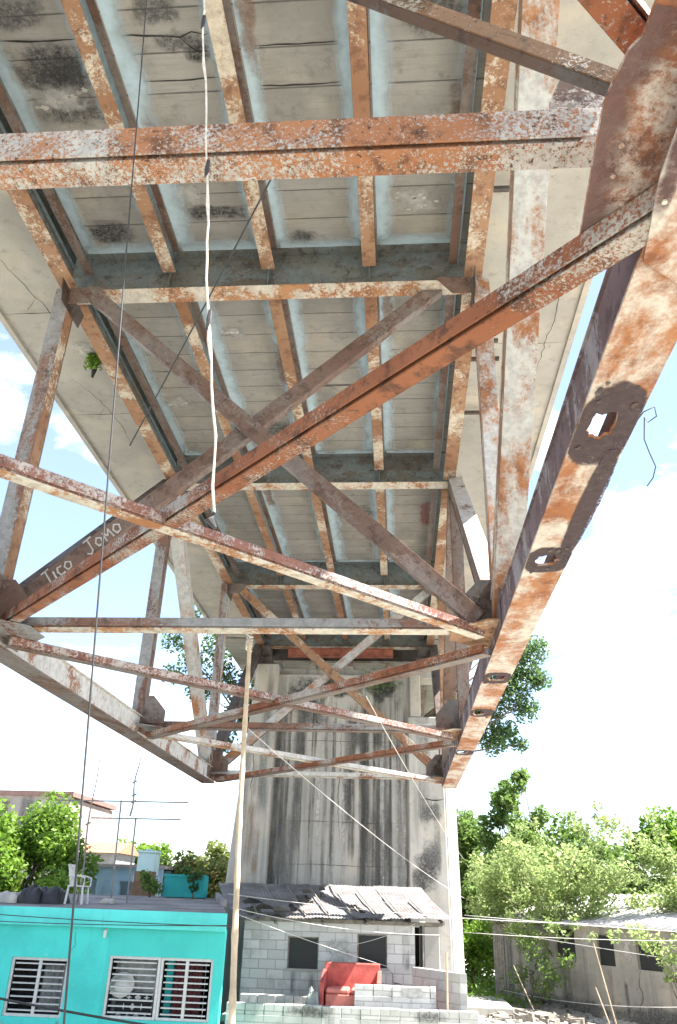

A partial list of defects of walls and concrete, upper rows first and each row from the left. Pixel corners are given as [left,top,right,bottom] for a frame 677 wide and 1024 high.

damp [0,2,39,29]
damp [134,0,177,22]
crack [118,31,209,52]
damp [156,36,210,62]
damp [11,45,104,122]
damp [89,223,131,243]
damp [259,713,440,889]